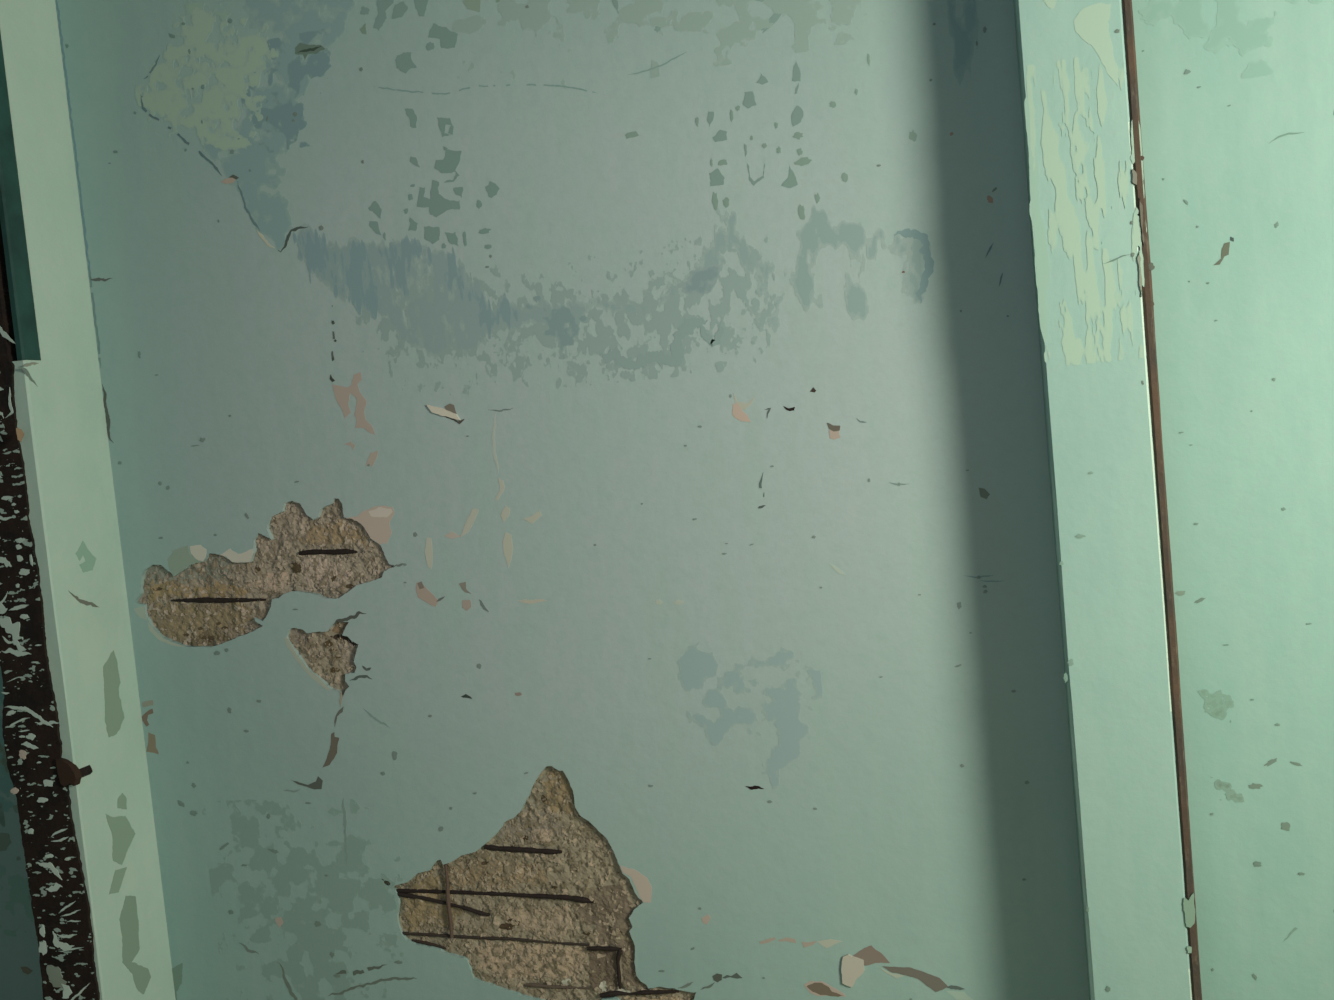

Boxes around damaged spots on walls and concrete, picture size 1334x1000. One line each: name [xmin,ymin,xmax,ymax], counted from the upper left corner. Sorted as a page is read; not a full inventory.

damp [202,0,934,401]
spalling [138,499,395,647]
spalling [288,622,358,696]
damp [0,669,34,937]
spalling [382,766,696,1000]
peeling [713,973,742,982]
spalling [760,937,973,1000]